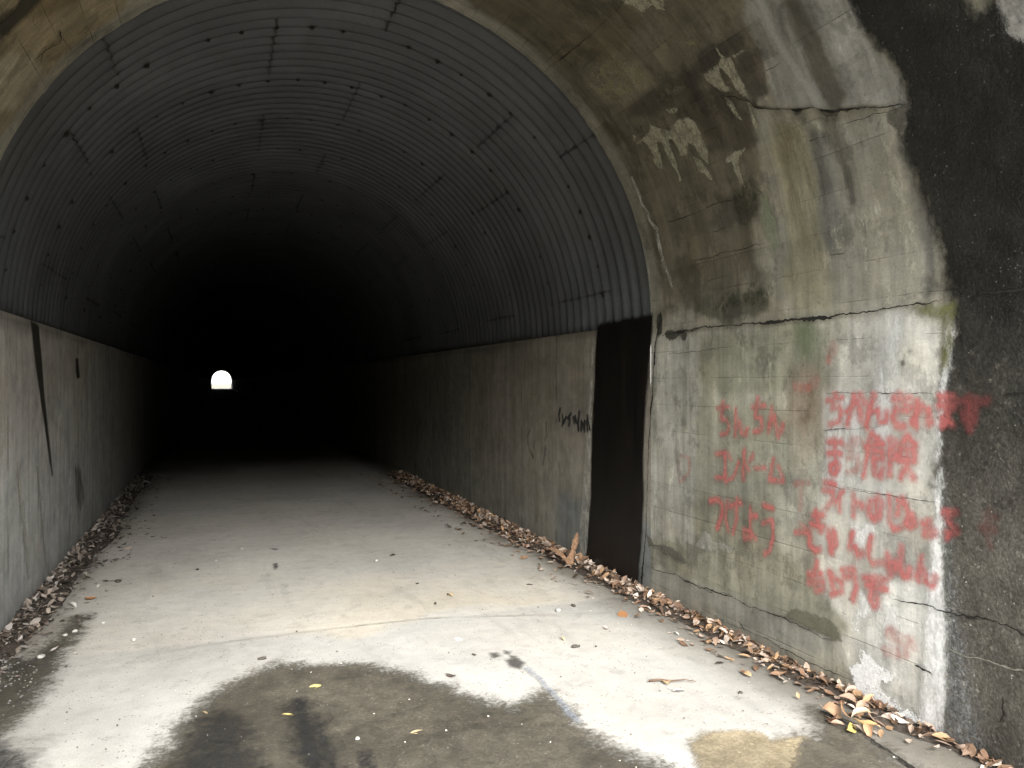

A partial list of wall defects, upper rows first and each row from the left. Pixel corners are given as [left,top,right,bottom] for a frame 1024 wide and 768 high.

peeling [633,108,712,182]
peeling [704,47,759,133]
peeling [726,150,744,184]
crack [724,96,906,141]
crack [641,299,942,683]
crack [893,599,1024,636]
crack [947,648,1024,671]
damp [138,661,671,768]